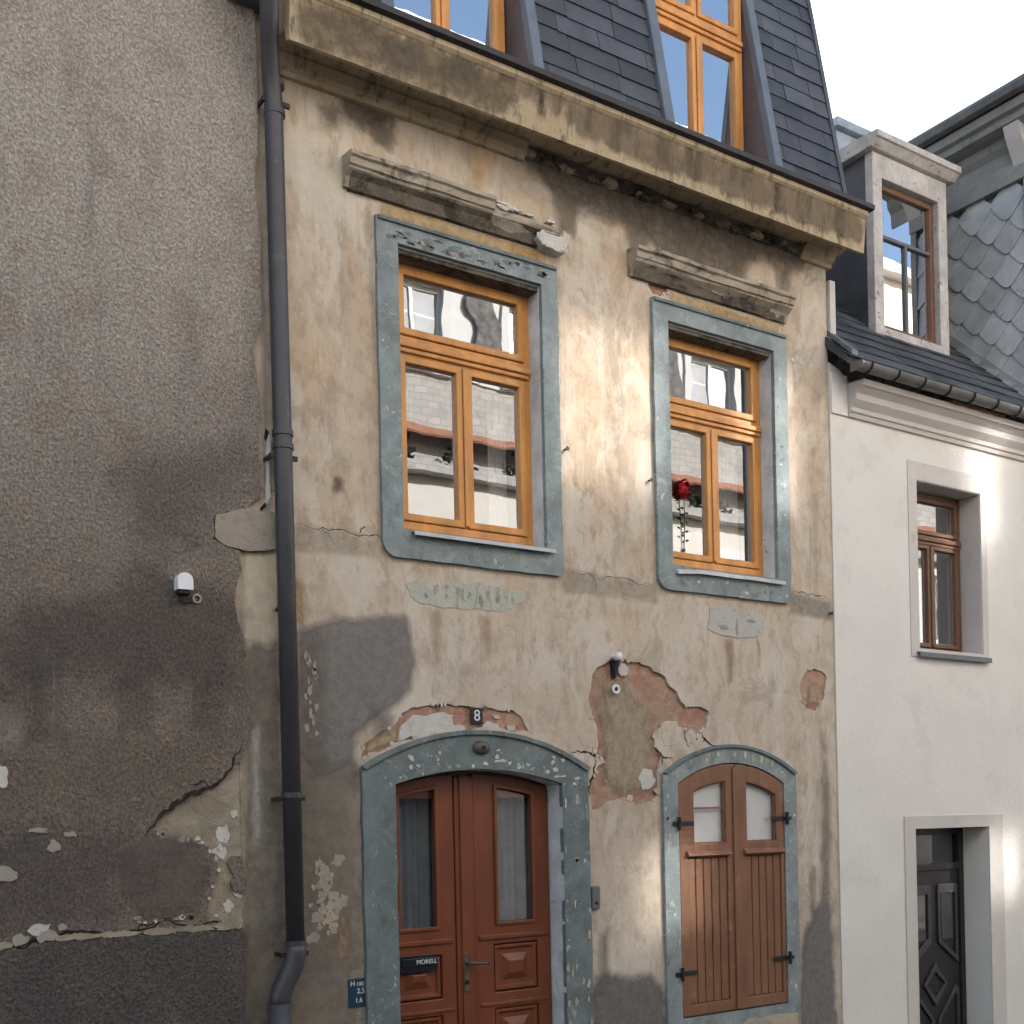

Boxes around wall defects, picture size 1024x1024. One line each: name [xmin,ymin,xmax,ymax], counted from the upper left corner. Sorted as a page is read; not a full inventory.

peeling [381,199,570,279]
spalling [522,146,801,256]
crack [299,523,380,545]
peeling [406,579,526,612]
crack [567,570,654,590]
flaking render [800,668,827,710]
flaking render [361,655,712,846]
crack [145,747,242,836]
flaking render [0,762,245,950]
crack [13,917,242,949]
peeling [306,854,348,944]
peeling [744,1013,799,1024]